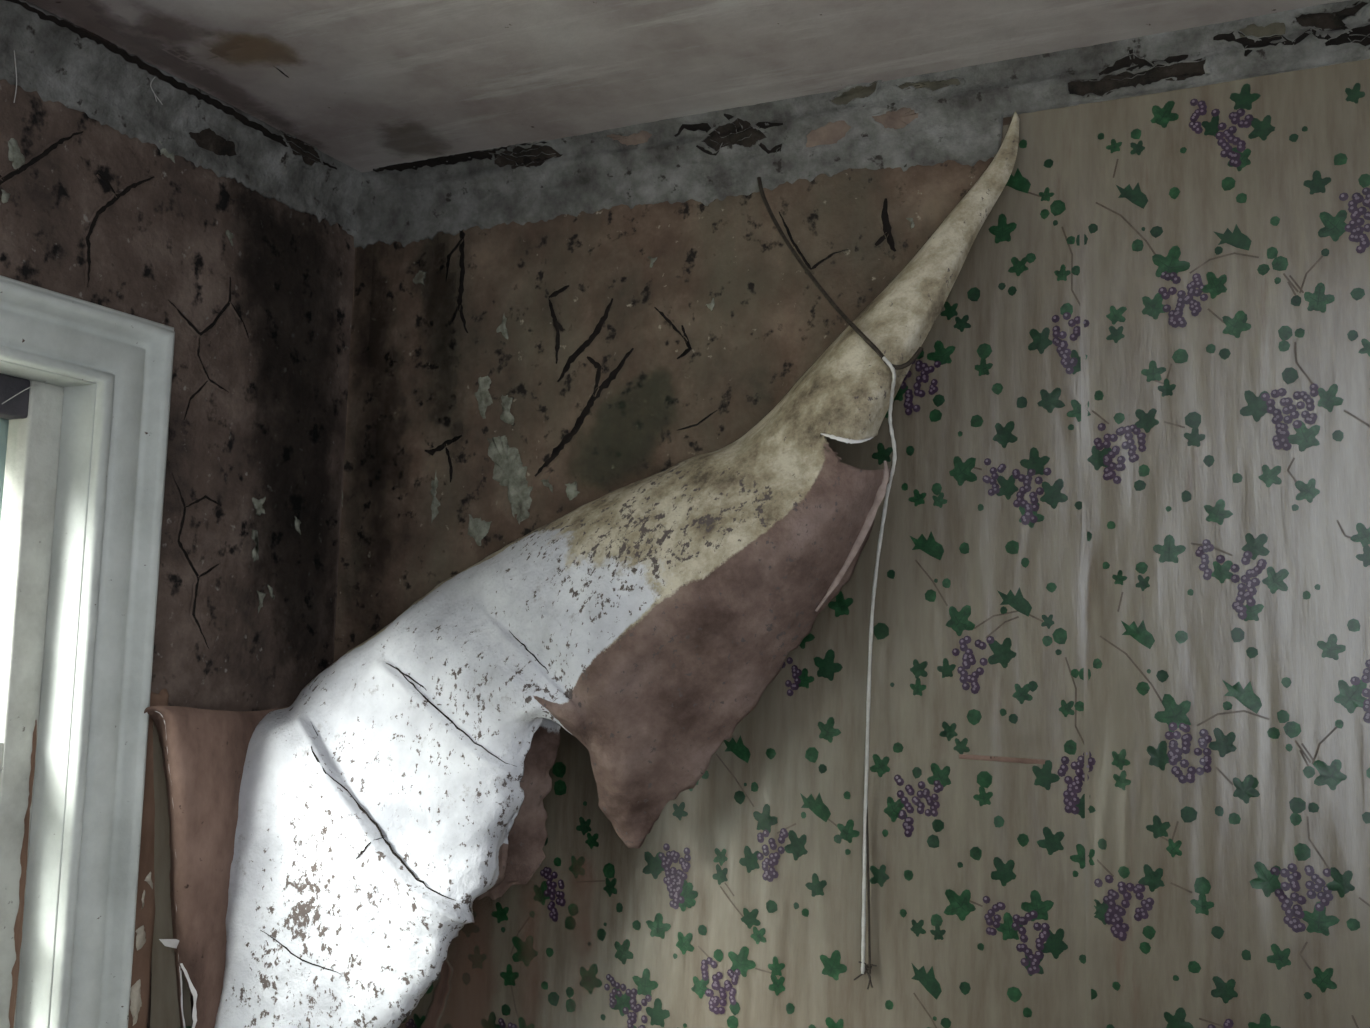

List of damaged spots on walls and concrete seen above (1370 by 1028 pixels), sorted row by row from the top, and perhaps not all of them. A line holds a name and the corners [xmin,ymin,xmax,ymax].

flaking render [1231,0,1370,43]
flaking render [1061,55,1213,100]
crack [0,129,84,187]
flaking render [184,123,240,159]
flaking render [489,141,568,174]
crack [83,173,155,287]
crack [654,306,694,361]
crack [534,284,635,478]
crack [424,434,462,483]
peeling [474,376,533,524]
crack [170,472,222,650]